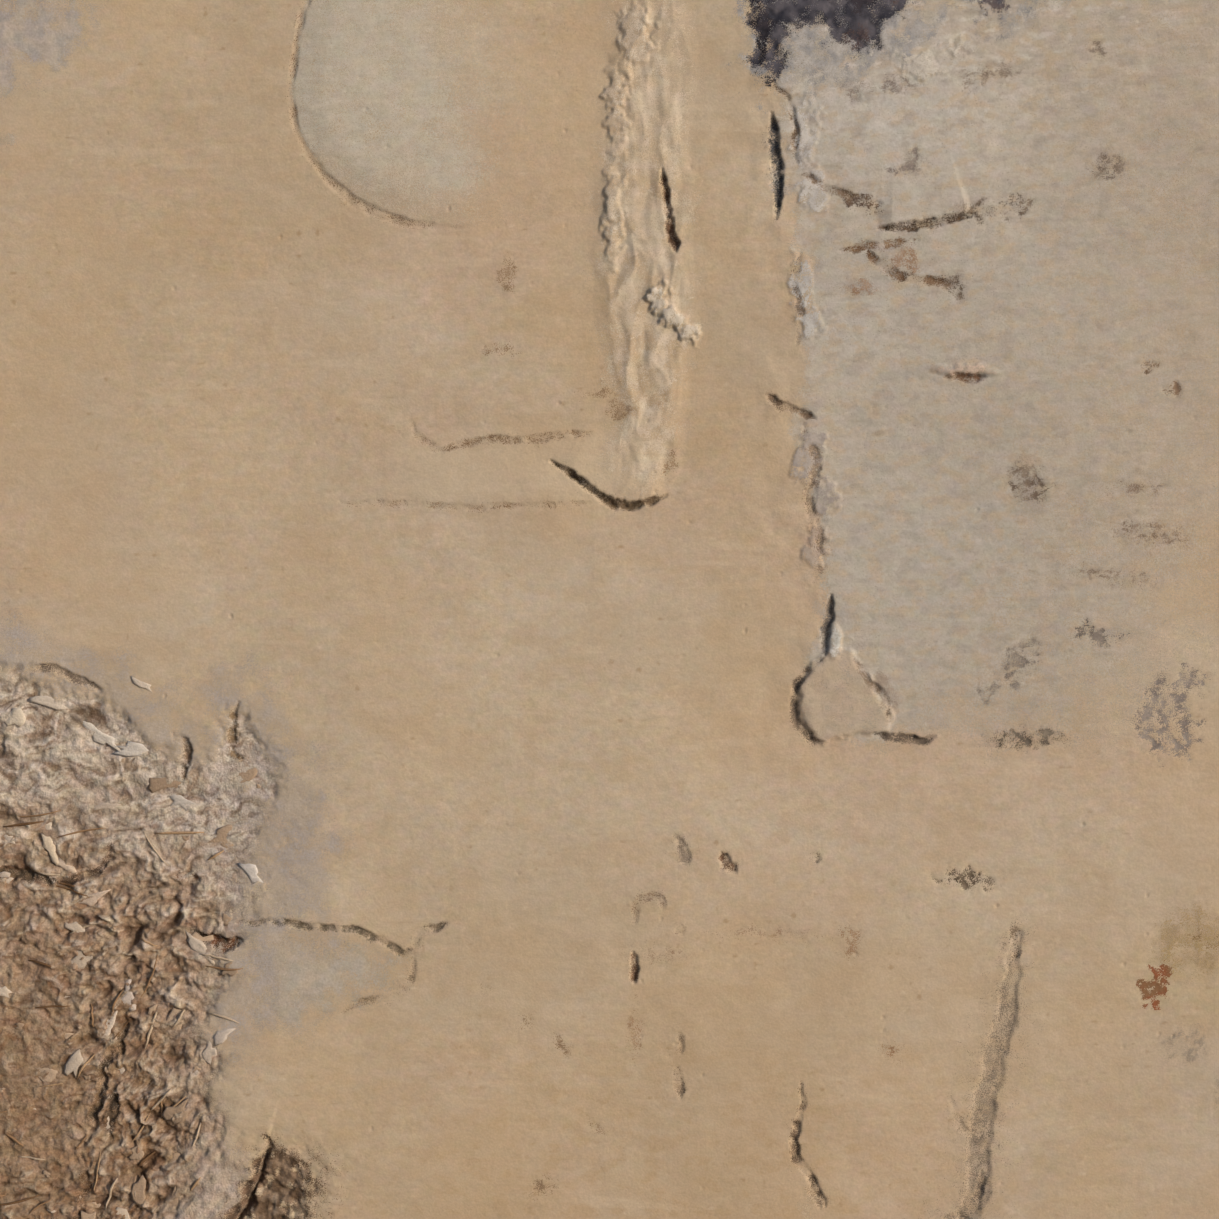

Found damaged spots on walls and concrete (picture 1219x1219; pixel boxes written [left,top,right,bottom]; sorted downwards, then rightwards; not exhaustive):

crack [287,4,457,231]
crack [349,423,664,513]
flaking render [0,665,280,1219]
crack [239,914,446,1012]
crack [918,917,1039,1219]
rust [1136,960,1182,1010]